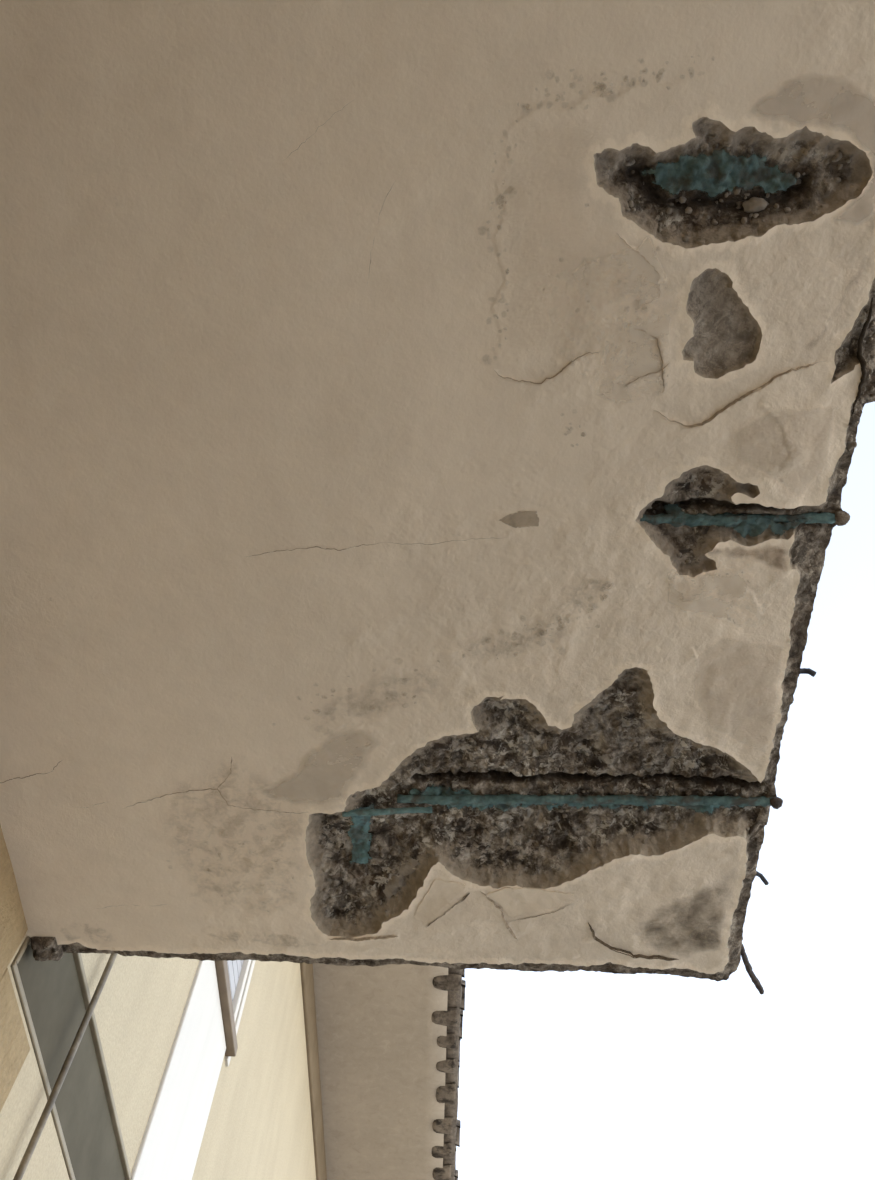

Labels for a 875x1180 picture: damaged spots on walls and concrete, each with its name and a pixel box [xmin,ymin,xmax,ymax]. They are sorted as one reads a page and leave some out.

spalling [593,117,873,249]
crack [619,236,813,428]
crack [495,351,601,384]
spalling [28,268,875,995]
crack [95,757,300,814]
crack [480,887,574,939]
crack [588,923,679,961]